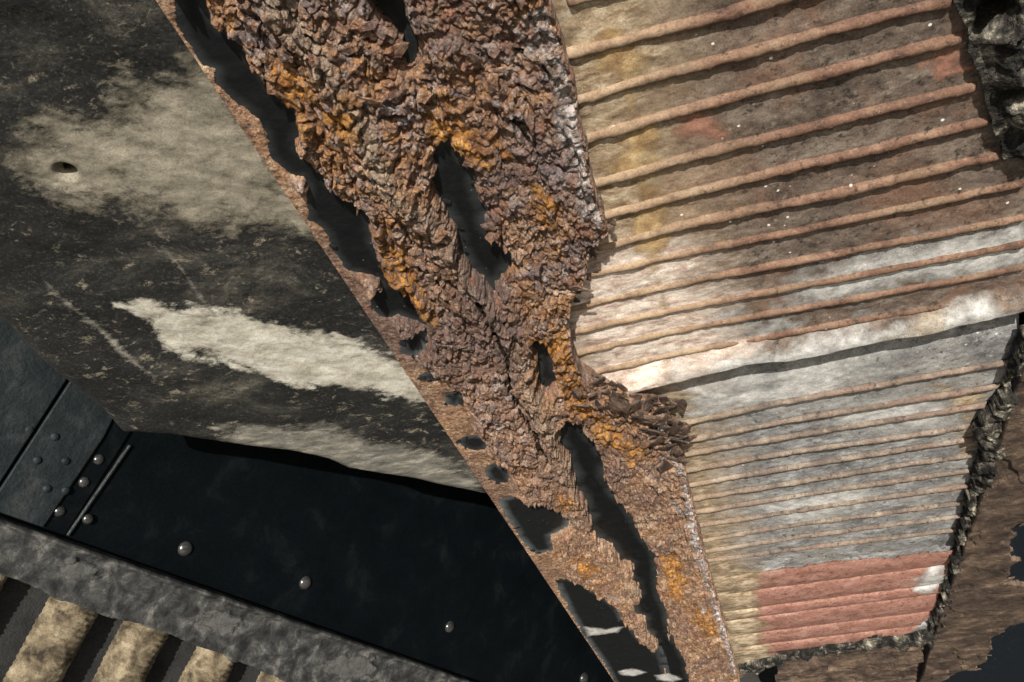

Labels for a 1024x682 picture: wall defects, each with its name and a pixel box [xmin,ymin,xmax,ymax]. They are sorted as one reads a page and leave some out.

corrosion [270,57,360,144]
corrosion [424,99,511,171]
corrosion [376,217,438,334]
peeling [557,276,594,311]
corrosion [533,331,646,468]
peeling [210,317,707,682]
corrosion [659,552,717,637]
peeling [1004,522,1024,582]
peeling [942,623,1024,682]